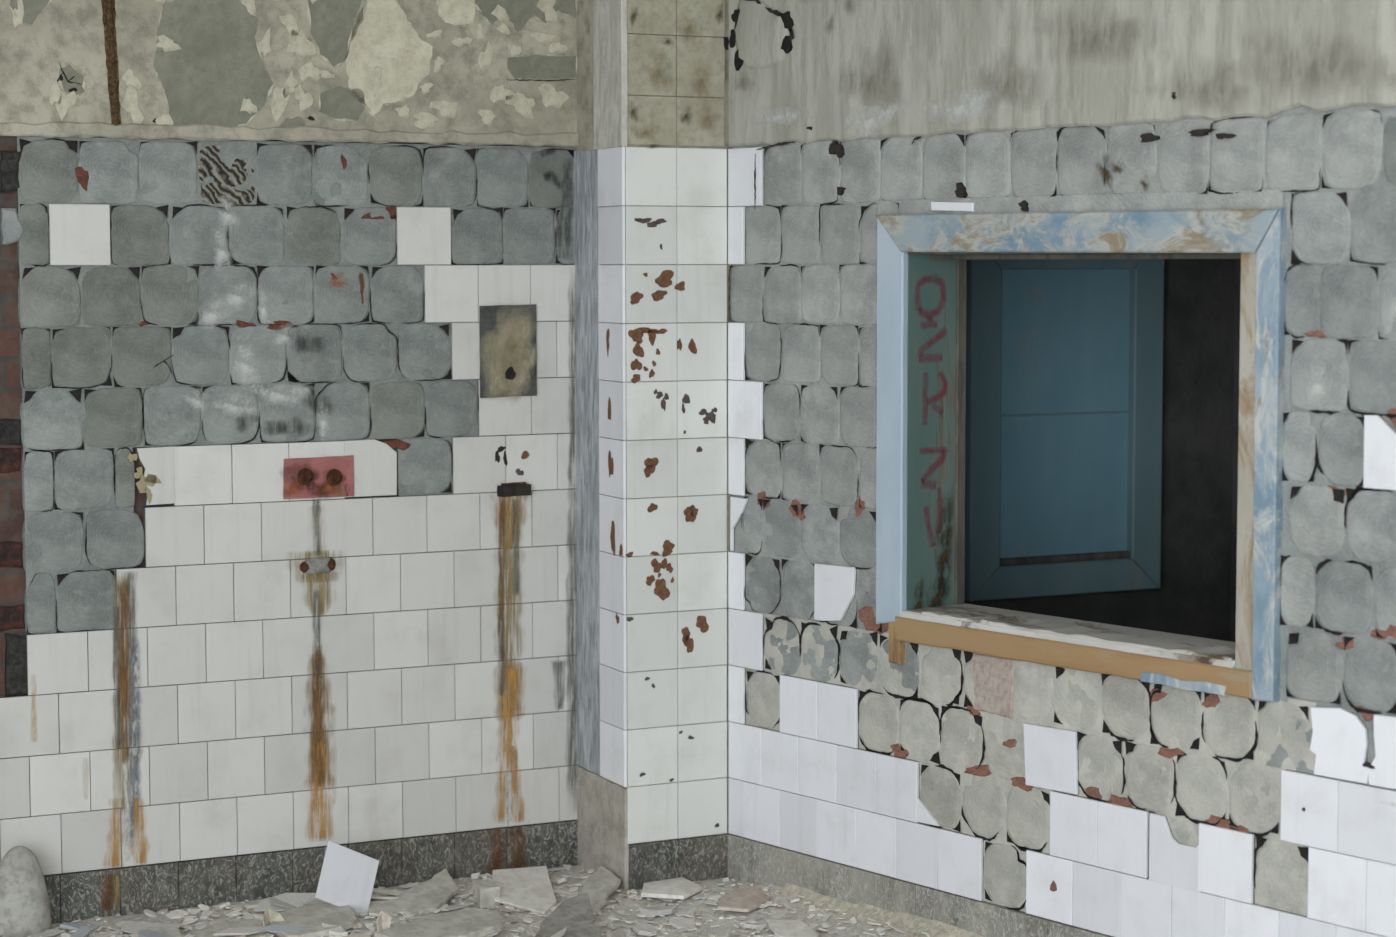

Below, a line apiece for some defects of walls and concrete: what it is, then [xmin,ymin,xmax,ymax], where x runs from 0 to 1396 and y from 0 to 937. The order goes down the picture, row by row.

corrosion [102,574,146,910]
spalling [0,0,577,697]
corrosion [287,473,336,839]
corrosion [492,496,523,870]
spalling [730,105,1396,916]